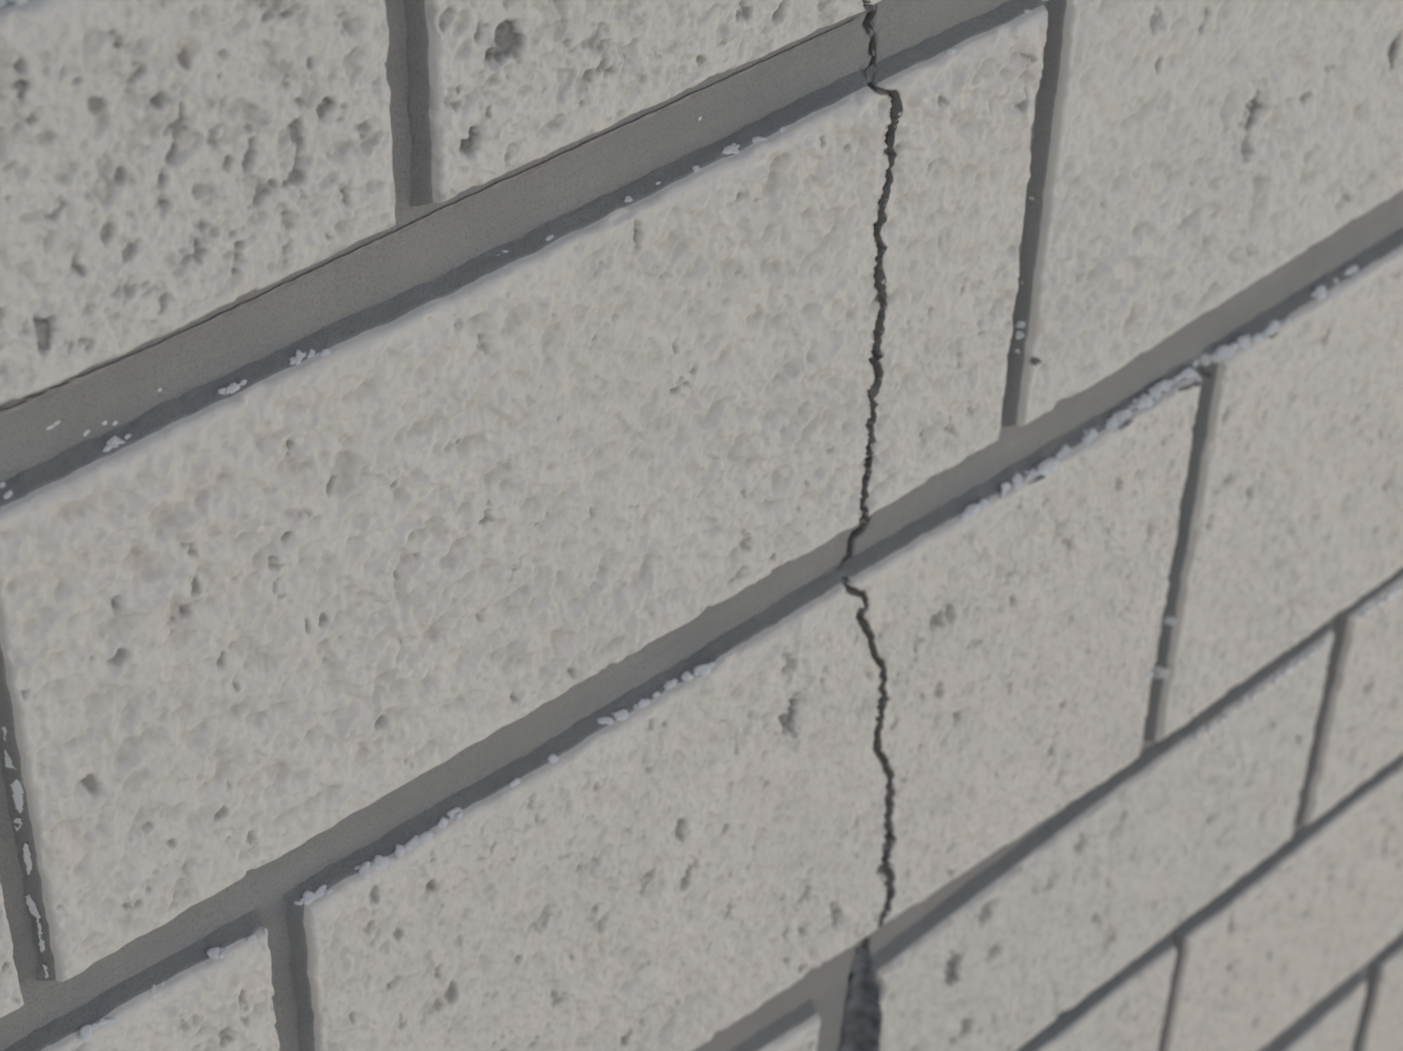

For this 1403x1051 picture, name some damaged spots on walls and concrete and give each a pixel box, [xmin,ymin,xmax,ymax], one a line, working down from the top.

crack [840,0,903,985]